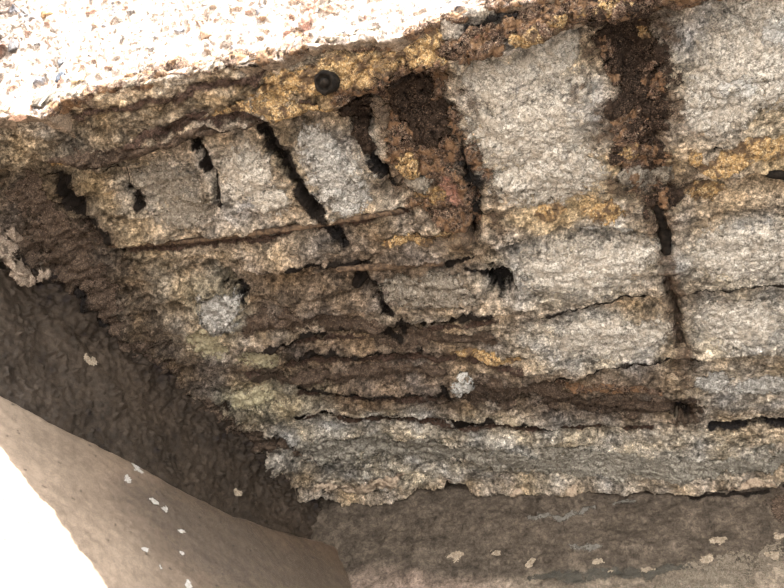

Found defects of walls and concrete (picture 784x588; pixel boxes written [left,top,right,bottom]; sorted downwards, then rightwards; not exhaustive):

spalling [670,0,784,142]
spalling [457,28,610,208]
spalling [218,140,292,218]
spalling [297,120,377,221]
flaking render [0,226,52,288]
corrosion [41,0,784,433]
spalling [379,269,483,314]
spalling [509,232,661,302]
spalling [548,315,673,365]
spalling [685,218,784,284]
spalling [692,293,784,352]
spalling [294,432,784,498]